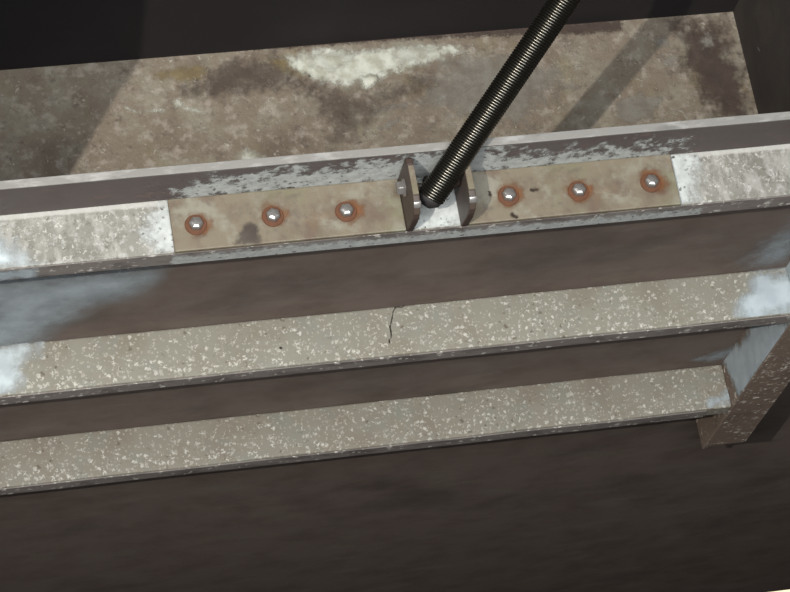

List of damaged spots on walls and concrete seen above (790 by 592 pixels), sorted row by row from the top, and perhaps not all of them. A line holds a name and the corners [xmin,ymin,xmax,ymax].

damp [280,27,529,113]
damp [560,20,623,35]